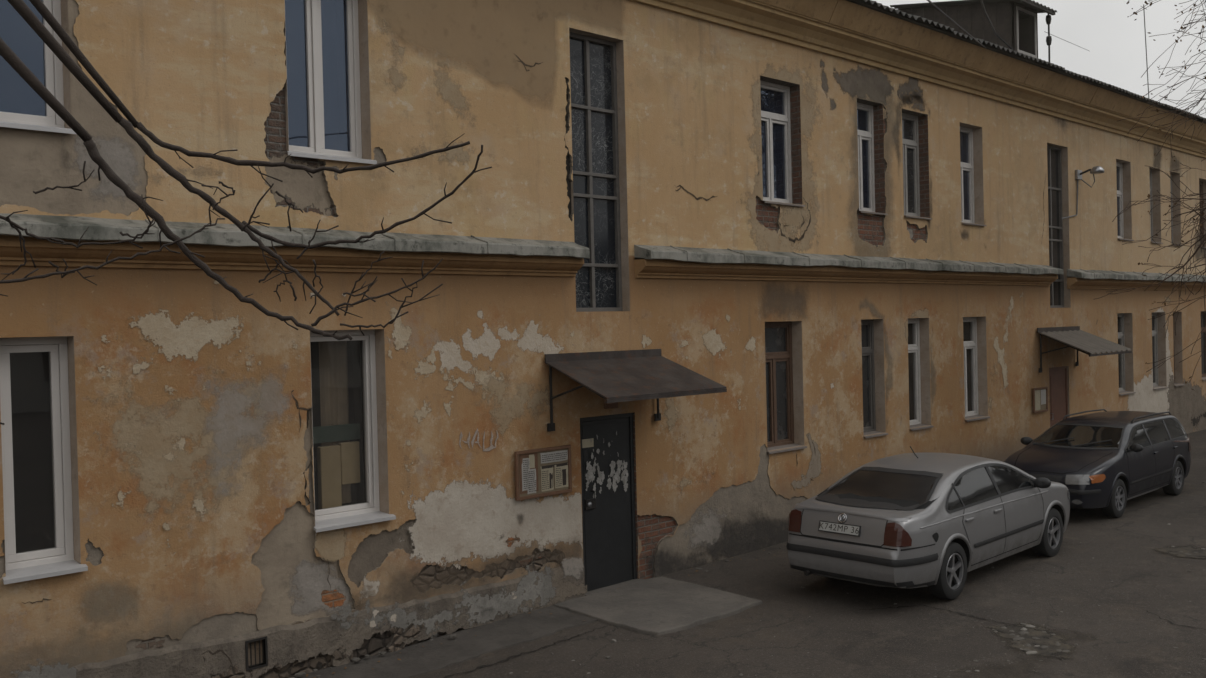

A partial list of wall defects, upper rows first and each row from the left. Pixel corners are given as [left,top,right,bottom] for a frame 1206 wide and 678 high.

flaking render [264,84,339,217]
crack [676,185,717,201]
peeling [745,64,819,252]
peeling [94,309,289,554]
crack [291,390,312,432]
peeling [385,302,574,434]
peeling [679,314,756,359]
flaking render [85,538,104,566]
peeling [211,478,584,678]